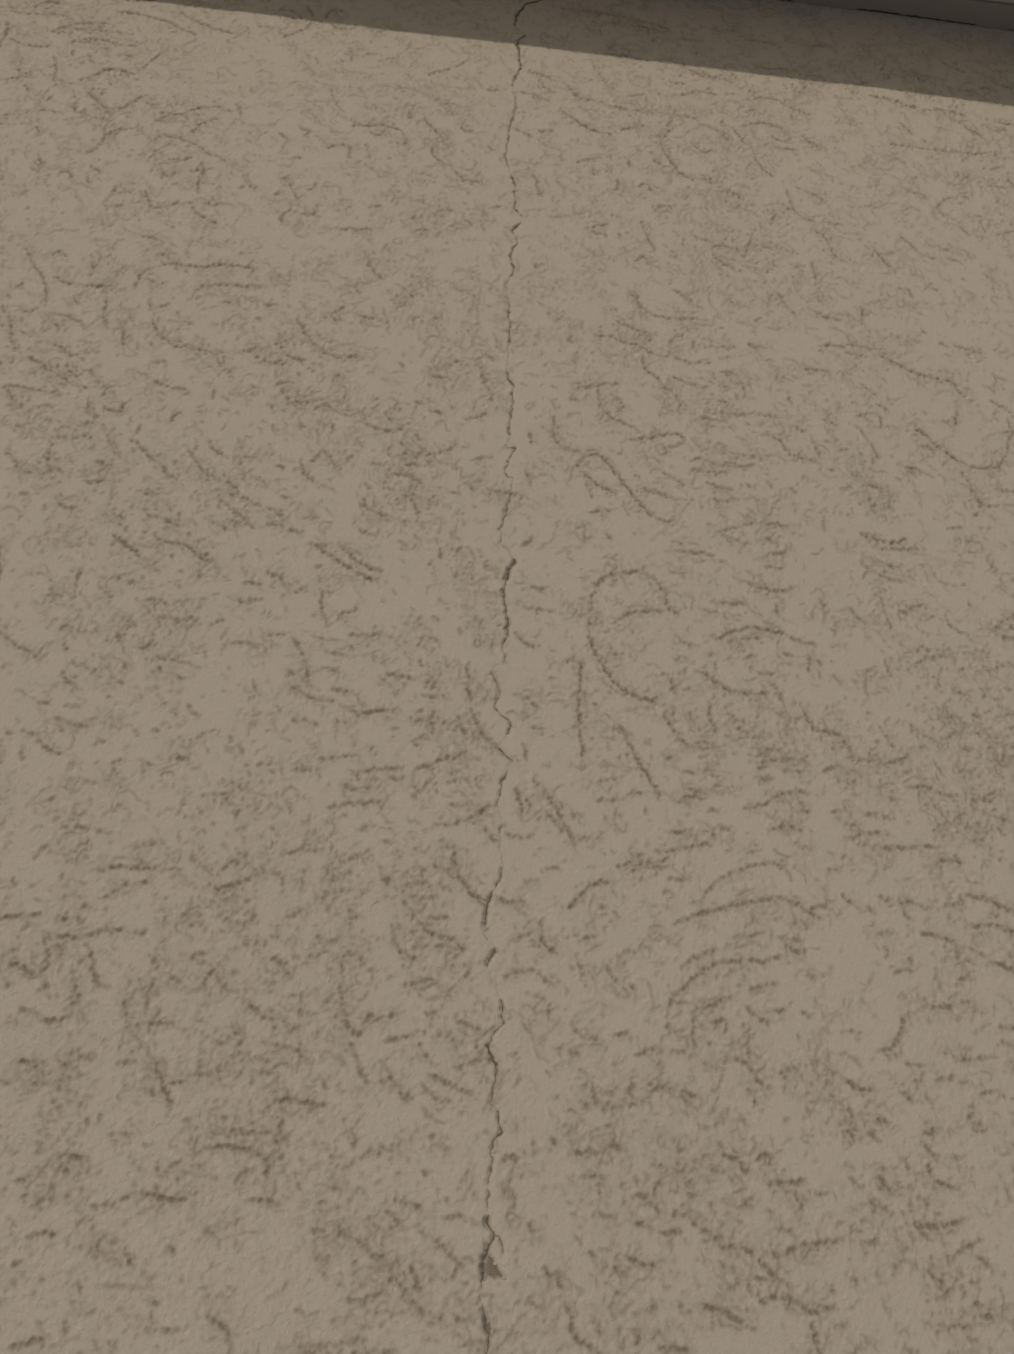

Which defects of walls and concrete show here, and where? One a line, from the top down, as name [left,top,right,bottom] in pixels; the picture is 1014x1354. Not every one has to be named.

crack [477,0,542,1353]